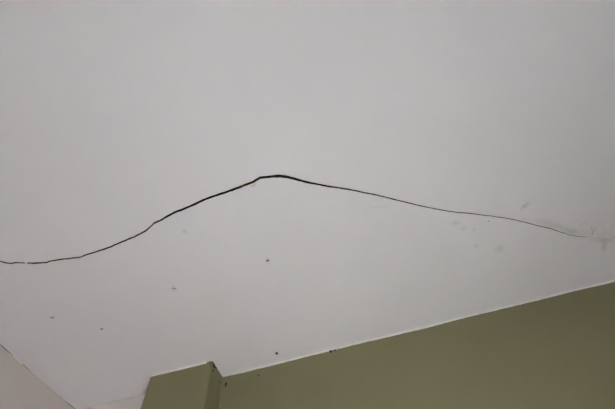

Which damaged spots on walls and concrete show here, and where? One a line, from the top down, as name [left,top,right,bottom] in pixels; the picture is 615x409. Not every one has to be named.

crack [0,175,614,265]